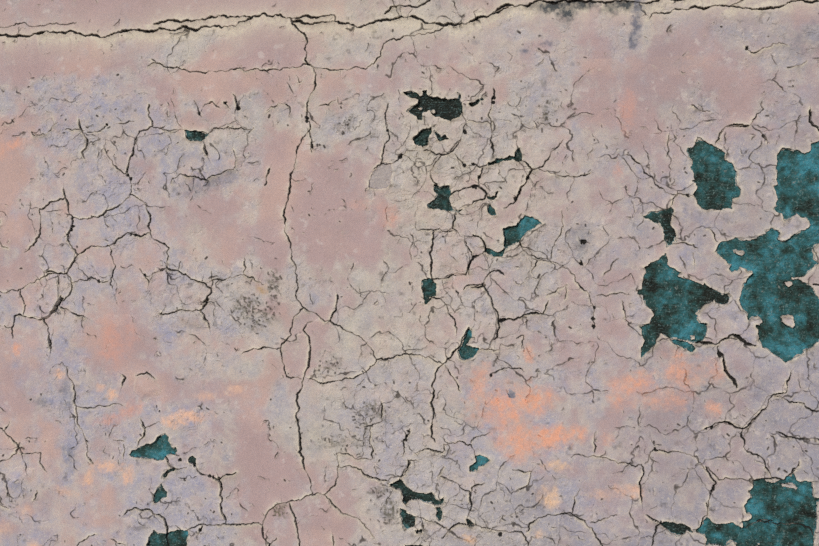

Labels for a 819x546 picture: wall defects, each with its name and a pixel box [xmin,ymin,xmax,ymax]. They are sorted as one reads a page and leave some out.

crack [650,0,819,18]
spalling [398,87,485,150]
crack [0,0,660,442]
spalling [423,181,470,214]
spalling [635,135,819,363]
crack [695,334,756,388]
spalling [129,433,177,503]
crack [188,402,415,546]
spalling [388,472,449,546]
crack [415,467,617,546]
crack [572,374,819,545]
spalling [660,473,819,546]